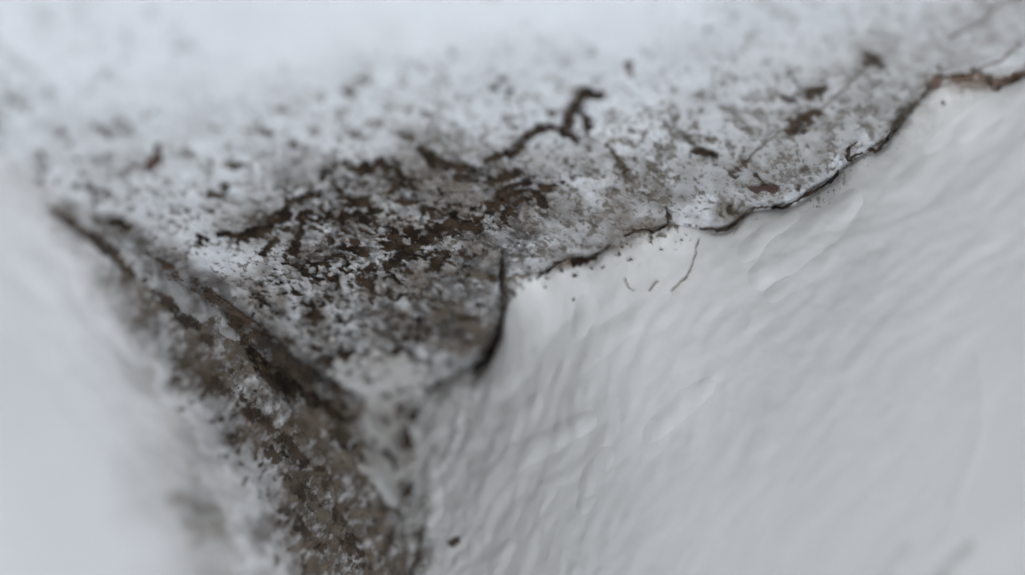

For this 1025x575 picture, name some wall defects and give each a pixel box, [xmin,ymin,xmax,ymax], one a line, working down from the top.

peeling [856,124,891,146]
peeling [820,151,843,178]
peeling [678,193,718,227]
peeling [782,187,808,206]
leakage [41,50,937,575]